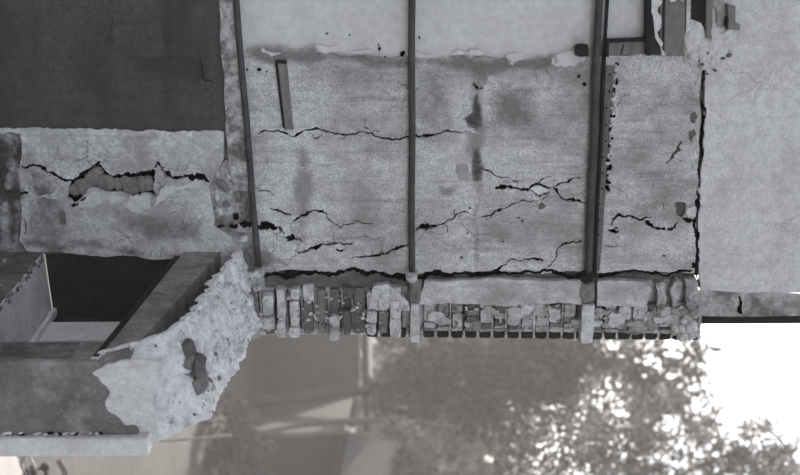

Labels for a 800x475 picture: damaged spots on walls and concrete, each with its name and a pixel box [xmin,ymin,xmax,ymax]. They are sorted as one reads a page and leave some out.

damp [252,47,322,64]
damp [439,55,552,85]
damp [465,97,483,180]
crack [22,161,210,183]
flaking render [69,164,203,213]
crack [233,70,706,287]
flaking render [181,338,209,395]
flaking render [93,358,160,445]